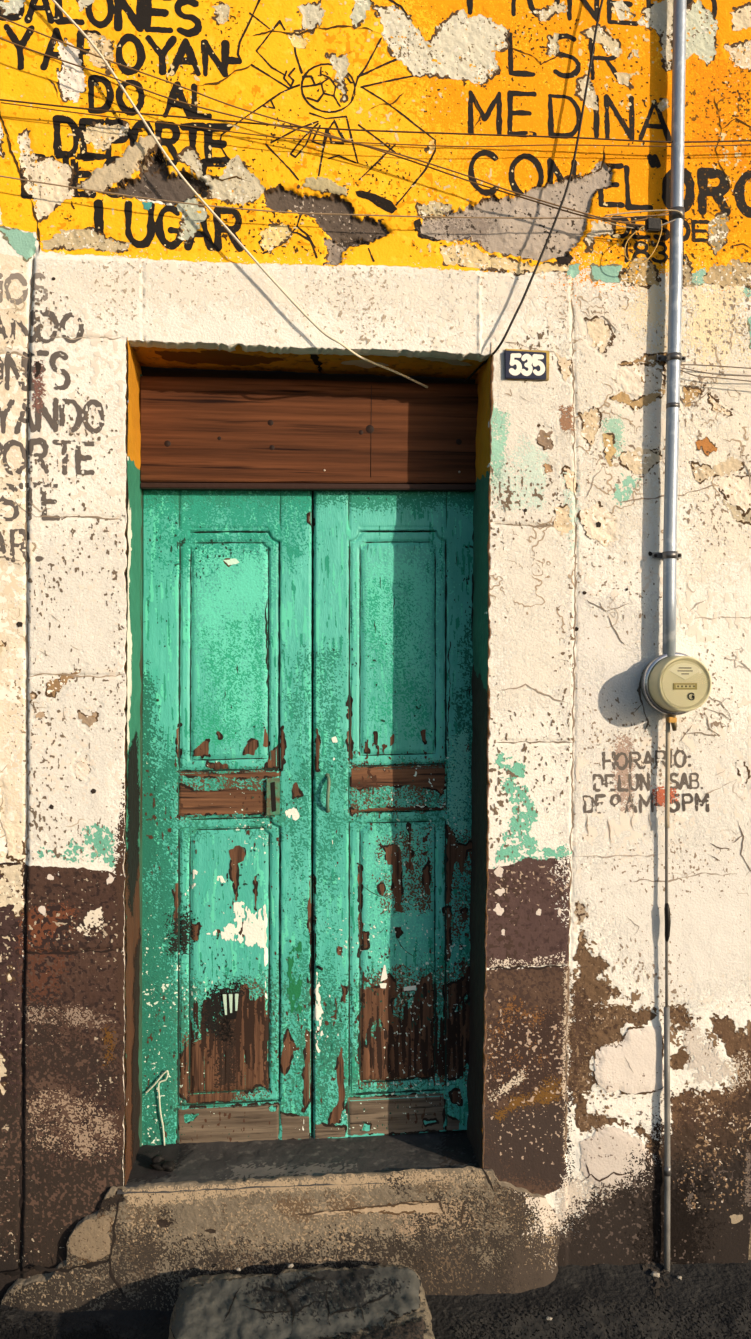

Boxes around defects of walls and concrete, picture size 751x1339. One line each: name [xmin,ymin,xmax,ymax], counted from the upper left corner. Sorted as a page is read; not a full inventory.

peeling [52,29,115,103]
peeling [325,52,350,103]
peeling [350,0,510,88]
peeling [580,0,751,89]
peeling [682,211,751,318]
peeling [489,317,751,641]
peeling [175,723,304,819]
crack [447,281,751,1182]
peeling [226,845,259,911]
peeling [337,695,472,963]
peeling [172,874,470,1144]
spalling [558,901,751,1160]